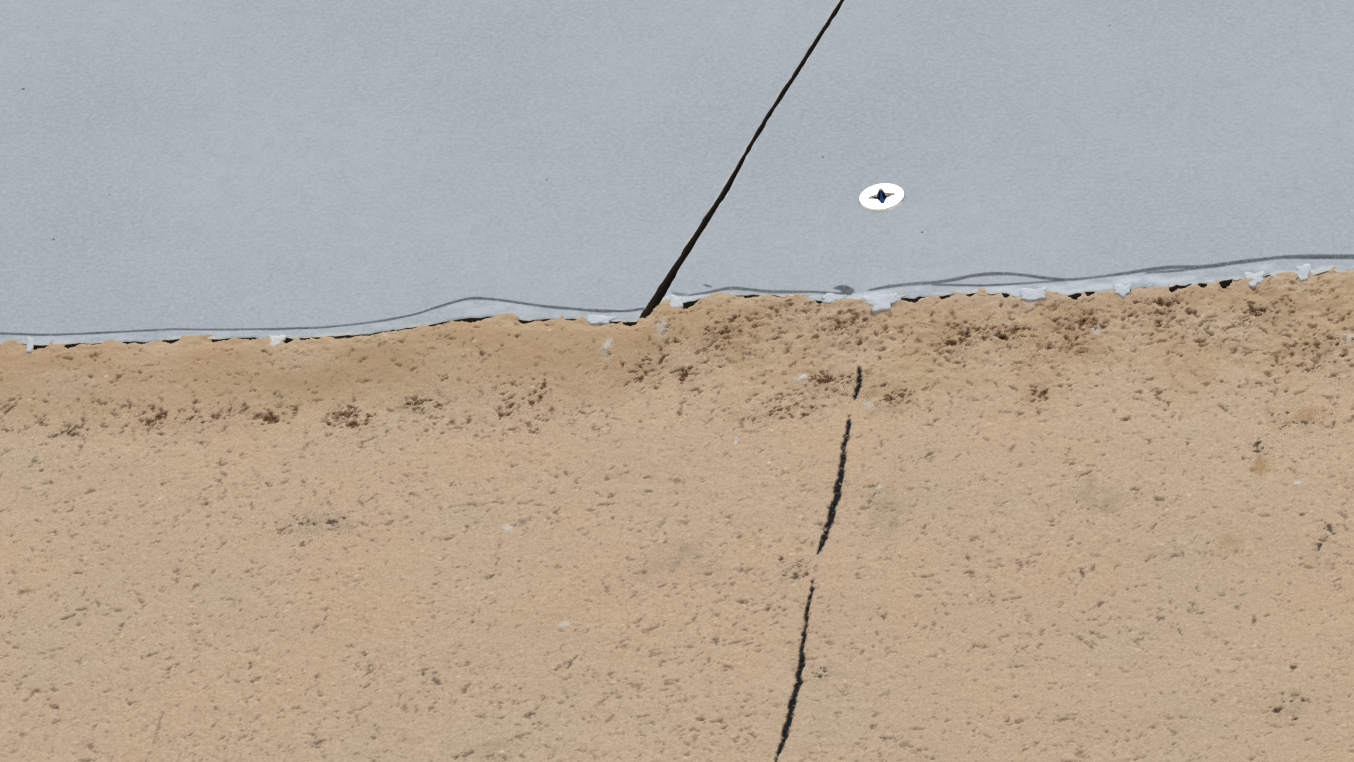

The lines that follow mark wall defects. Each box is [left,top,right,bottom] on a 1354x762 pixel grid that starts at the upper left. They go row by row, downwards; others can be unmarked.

crack [775,366,862,762]